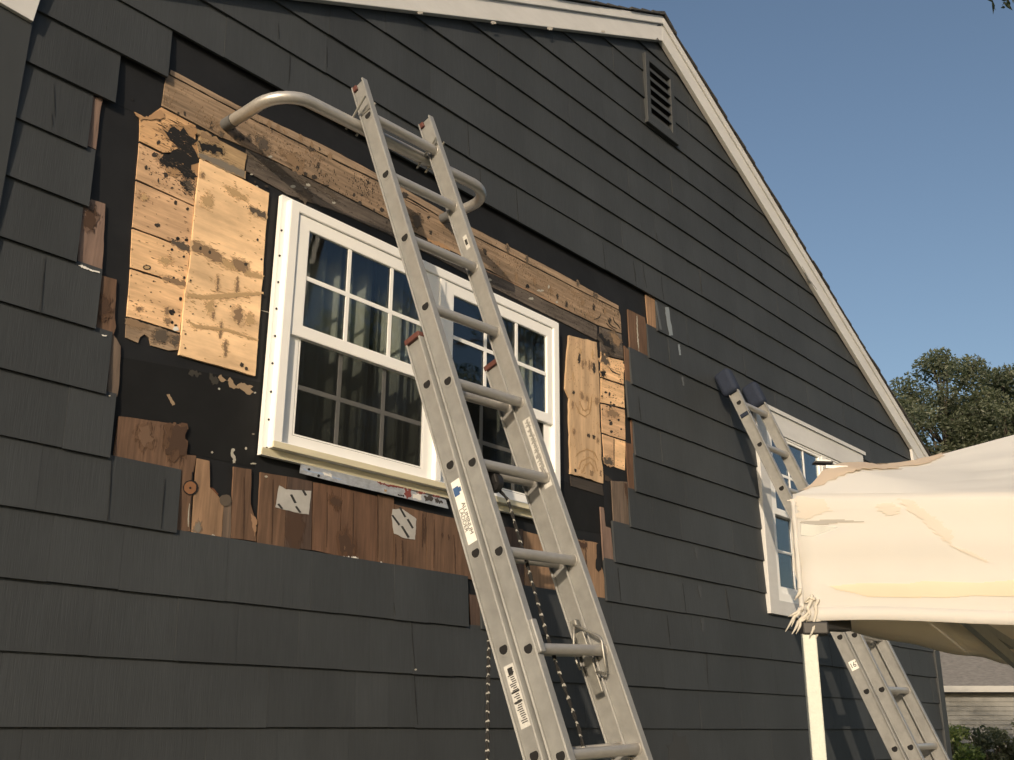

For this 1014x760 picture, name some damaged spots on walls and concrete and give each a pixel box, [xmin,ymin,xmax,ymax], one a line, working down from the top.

peeling [135,110,165,120]
damp [125,73,391,358]
peeling [188,369,256,395]
peeling [384,489,443,504]